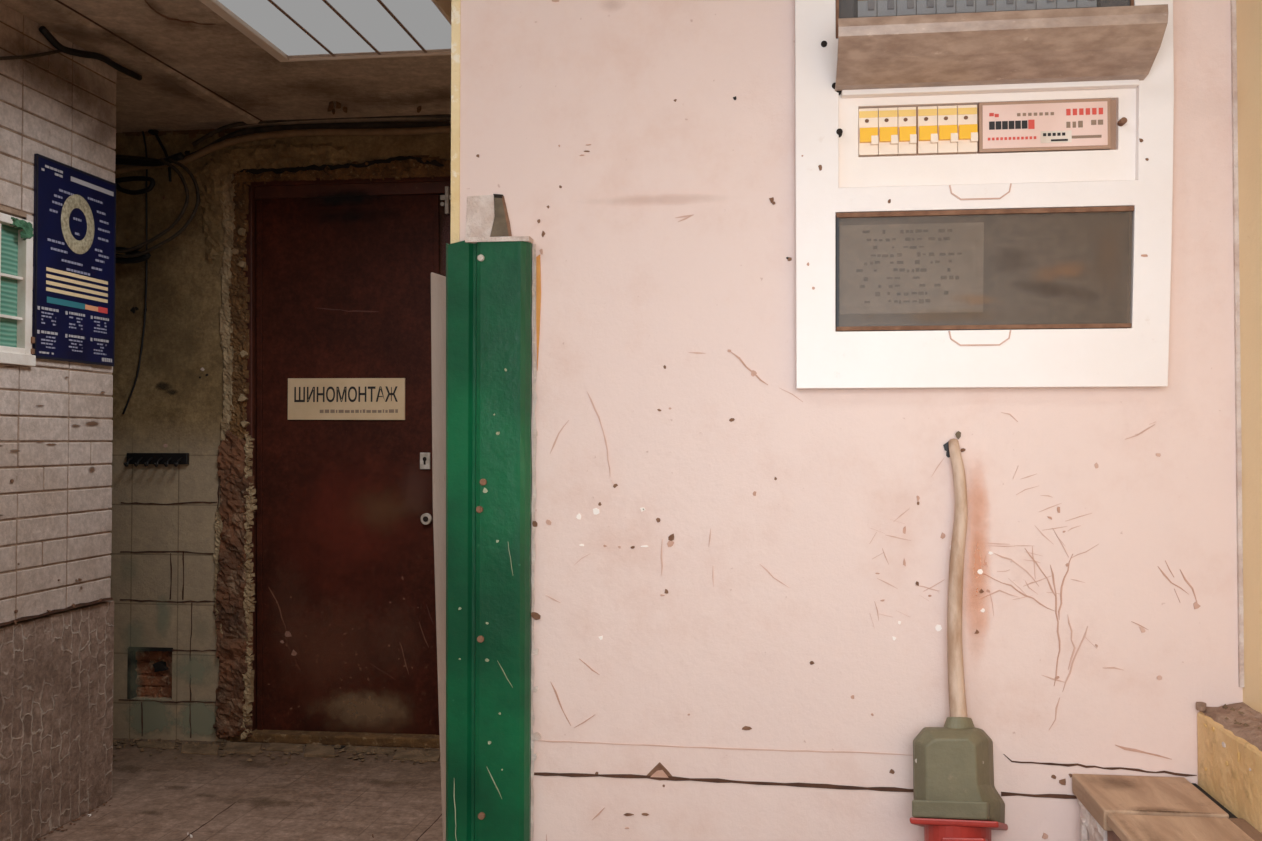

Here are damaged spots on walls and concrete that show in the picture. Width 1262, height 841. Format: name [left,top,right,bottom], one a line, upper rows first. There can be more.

crack [144,0,215,25]
flaking render [135,155,451,762]
spalling [127,647,173,699]